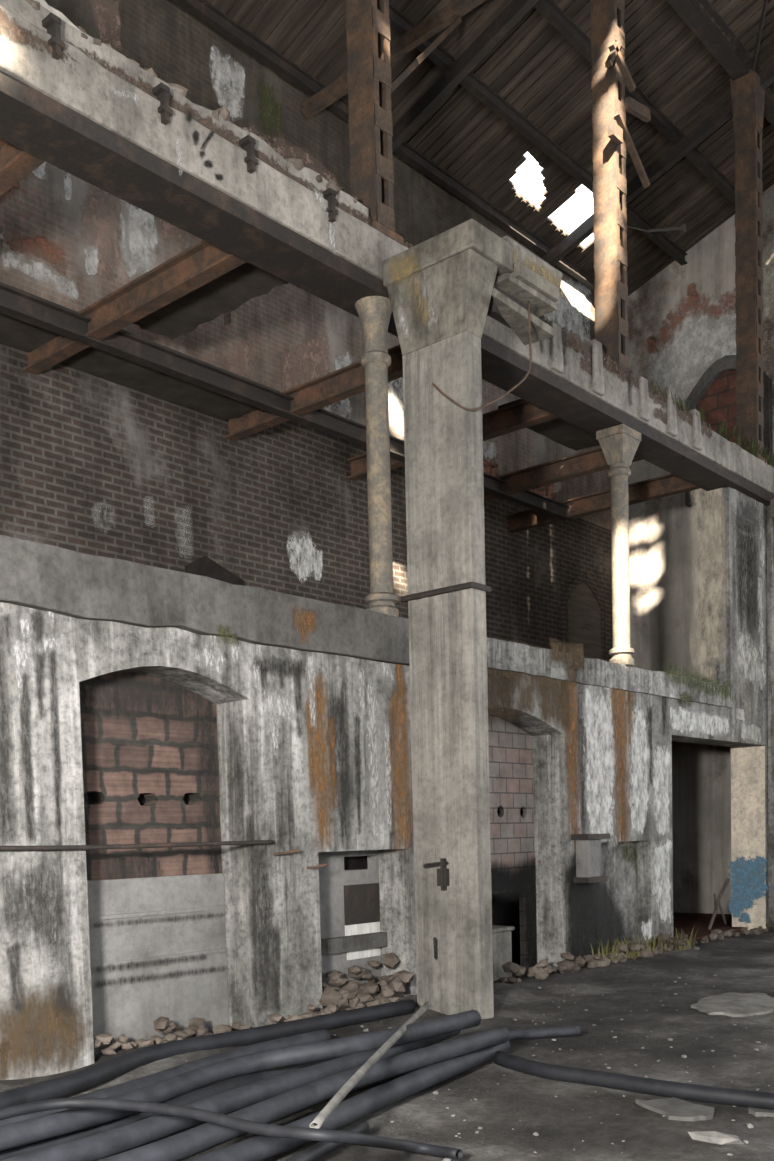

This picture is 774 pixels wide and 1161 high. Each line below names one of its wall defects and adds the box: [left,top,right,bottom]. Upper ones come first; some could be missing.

spalling [0,0,413,249]
flaking render [0,232,78,299]
flaking render [544,278,736,438]
leakage [0,611,64,839]
corrosion [306,679,335,844]
corrosion [387,664,410,845]
corrosion [612,689,633,839]